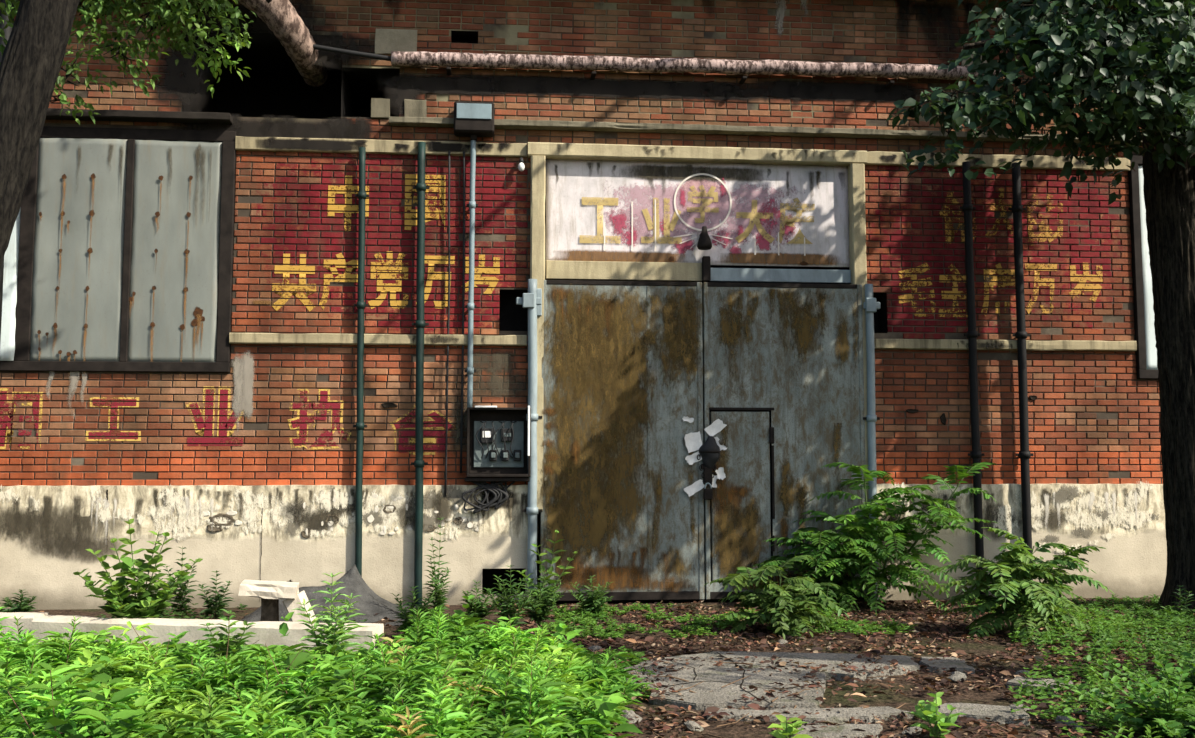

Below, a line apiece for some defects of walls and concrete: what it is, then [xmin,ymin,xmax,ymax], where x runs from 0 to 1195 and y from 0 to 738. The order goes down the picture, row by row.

rust [37,174,89,361]
rust [180,212,205,361]
rust [720,288,858,376]
rust [537,287,702,591]
peeling [0,485,41,511]
leakage [0,496,118,561]
leakage [135,489,243,528]
peeling [88,483,485,543]
leakage [269,487,369,532]
leakage [433,490,528,524]
rust [707,423,849,590]
leakage [1041,488,1149,530]